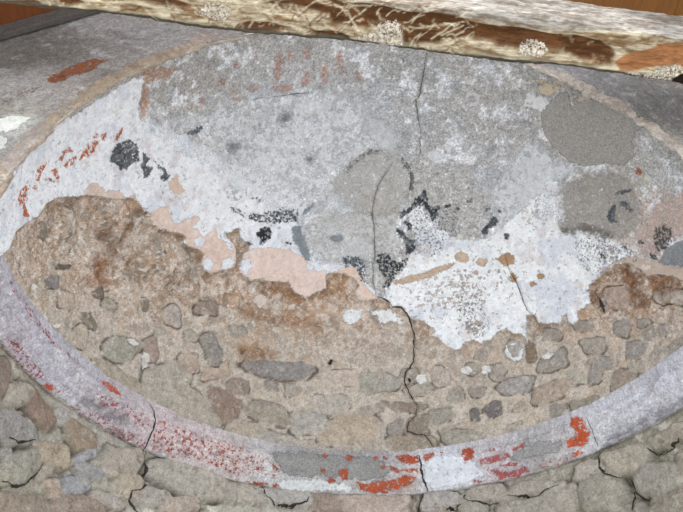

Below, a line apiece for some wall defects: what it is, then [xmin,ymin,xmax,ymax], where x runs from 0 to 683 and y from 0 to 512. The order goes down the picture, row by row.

rust [3,59,107,104]
crack [408,52,427,196]
rust [18,132,107,217]
spalling [0,78,683,452]
crack [372,169,434,512]
crack [128,404,156,512]
rust [321,452,443,494]
rust [461,444,530,480]
flaking render [508,440,562,462]
rust [539,417,590,468]